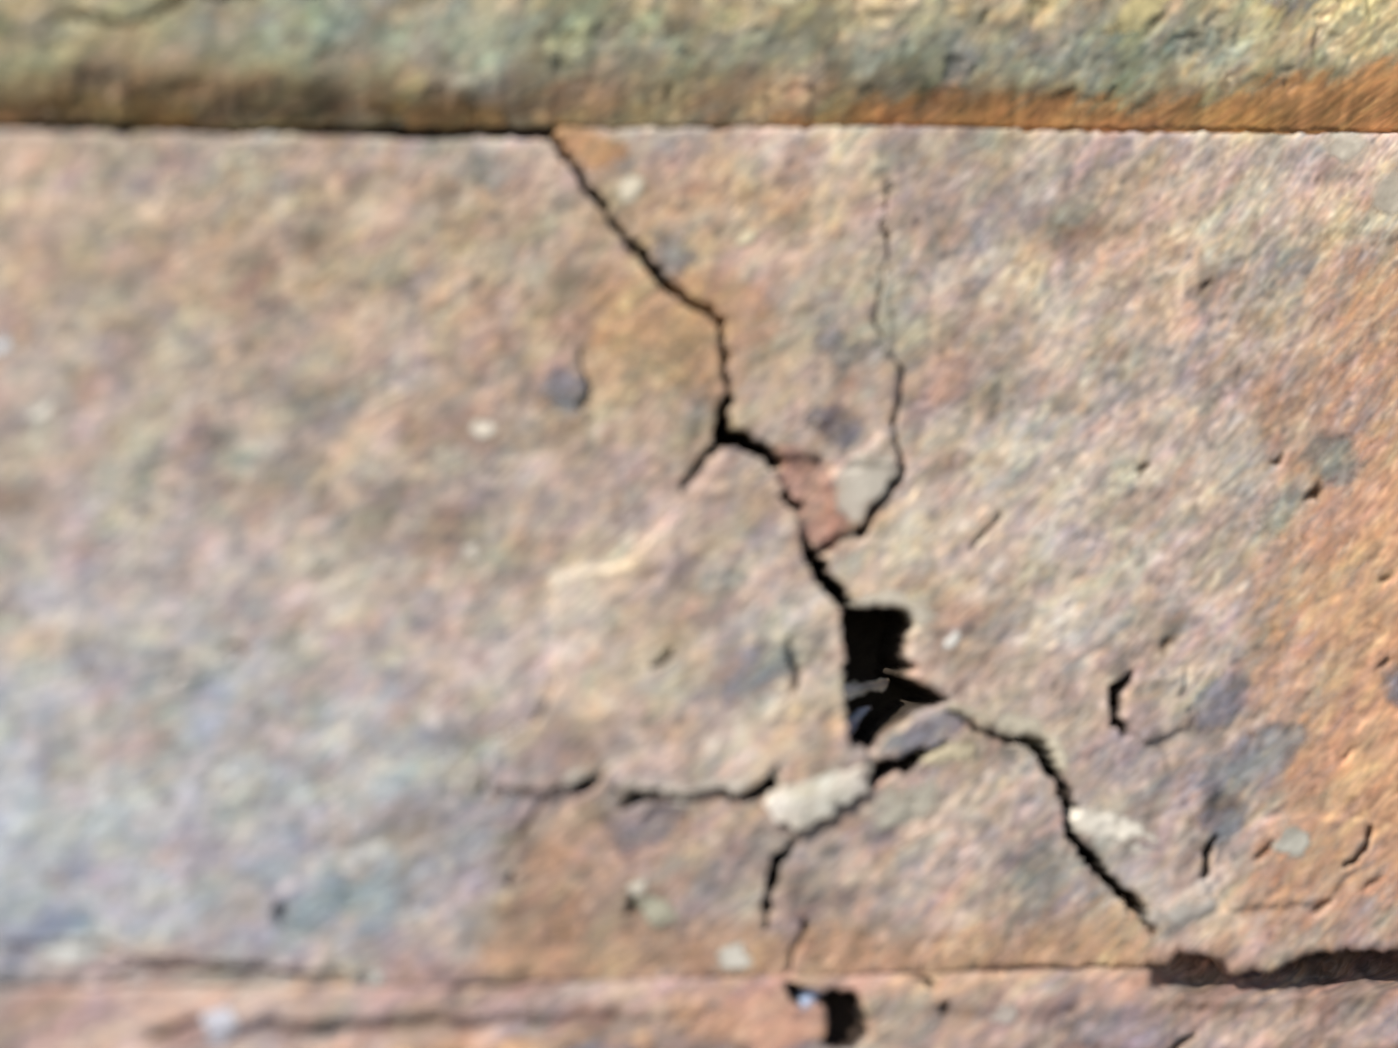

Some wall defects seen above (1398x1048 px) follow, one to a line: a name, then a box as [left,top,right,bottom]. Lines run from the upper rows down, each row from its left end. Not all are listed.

crack [551,136,903,609]
crack [651,651,673,667]
crack [787,638,800,690]
crack [1107,671,1130,736]
crack [572,766,778,808]
crack [853,710,1154,935]
crack [761,842,808,957]
peeling [786,977,948,1048]